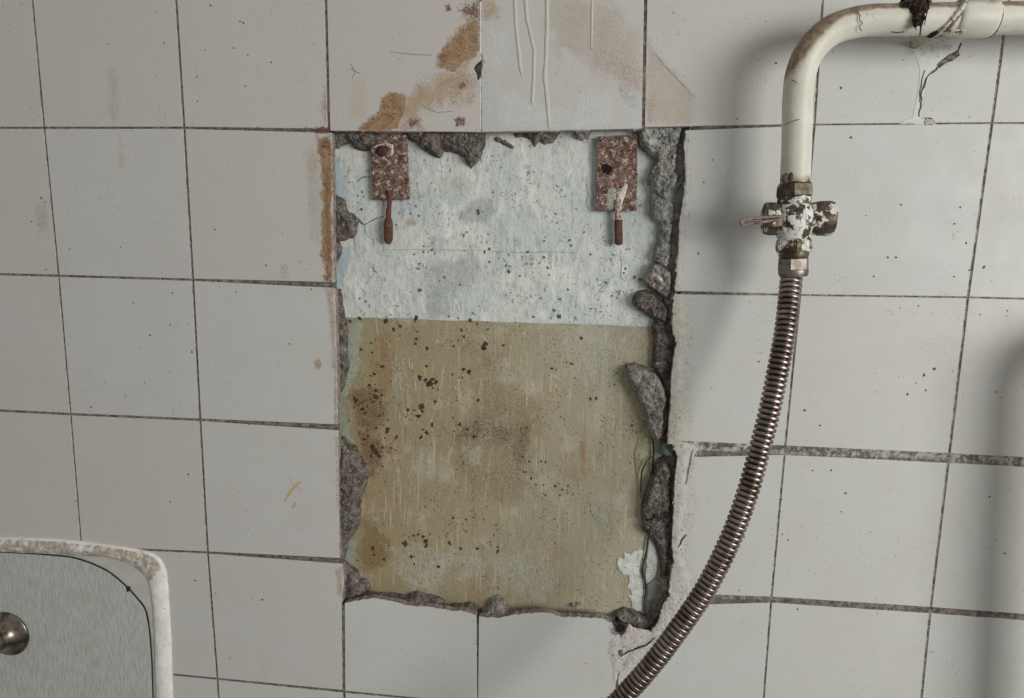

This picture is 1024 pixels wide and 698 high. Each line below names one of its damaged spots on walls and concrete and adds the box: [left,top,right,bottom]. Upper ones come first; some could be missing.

corrosion [347,0,483,135]
water stain [537,0,698,128]
crack [891,31,962,117]
spalling [407,132,561,169]
corrosion [301,78,403,507]
spalling [333,132,536,615]
water stain [442,325,545,510]
spalling [555,127,688,632]
water stain [384,541,559,597]